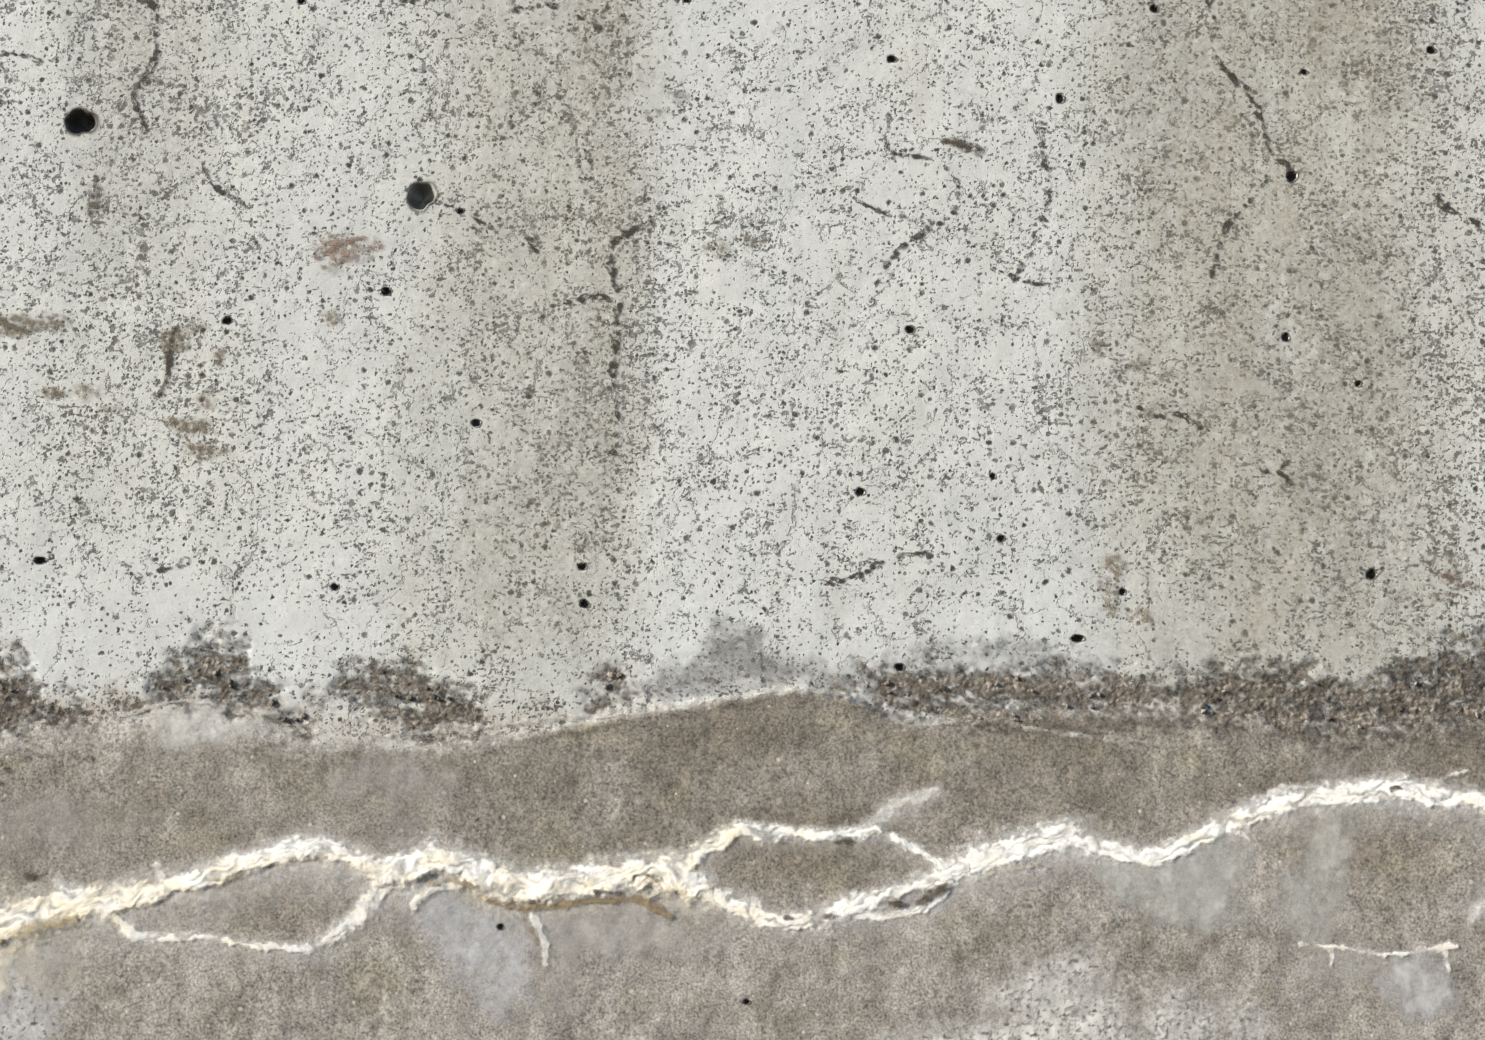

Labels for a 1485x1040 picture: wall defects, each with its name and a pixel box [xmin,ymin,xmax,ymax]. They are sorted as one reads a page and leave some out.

crack [131,0,160,149]
crack [1205,0,1291,278]
crack [566,205,665,455]
spalling [0,642,97,742]
spalling [123,632,486,744]
spalling [586,663,637,718]
spalling [832,629,1485,750]
crack [0,770,1485,966]
leakage [1099,845,1246,933]
leakage [1271,803,1351,948]
leakage [423,890,685,1011]
crack [1298,904,1481,1019]